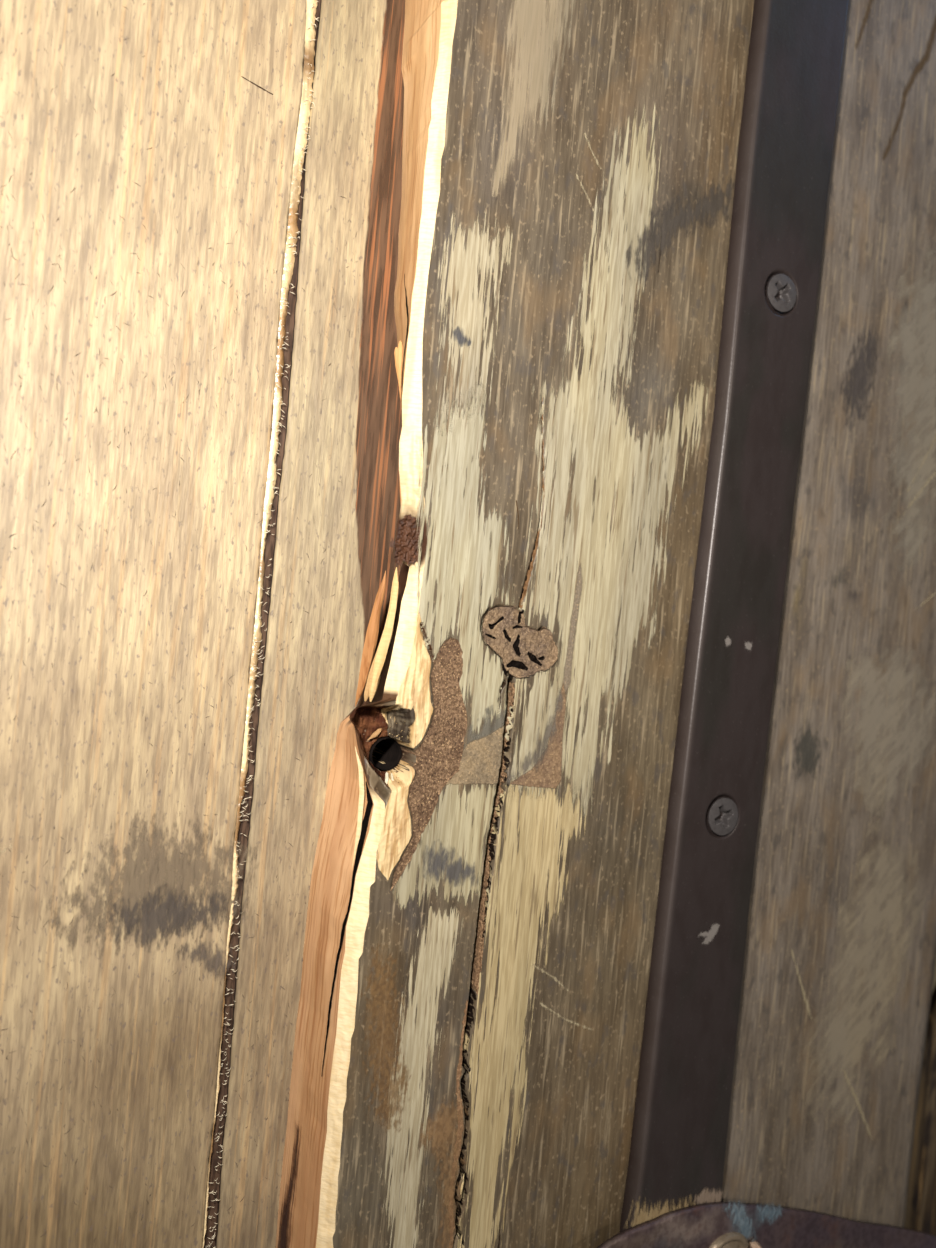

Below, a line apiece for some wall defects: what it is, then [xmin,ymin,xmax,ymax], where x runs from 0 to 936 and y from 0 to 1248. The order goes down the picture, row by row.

peeling [372,613,433,880]
water stain [54,815,257,976]
crack [448,680,515,1248]